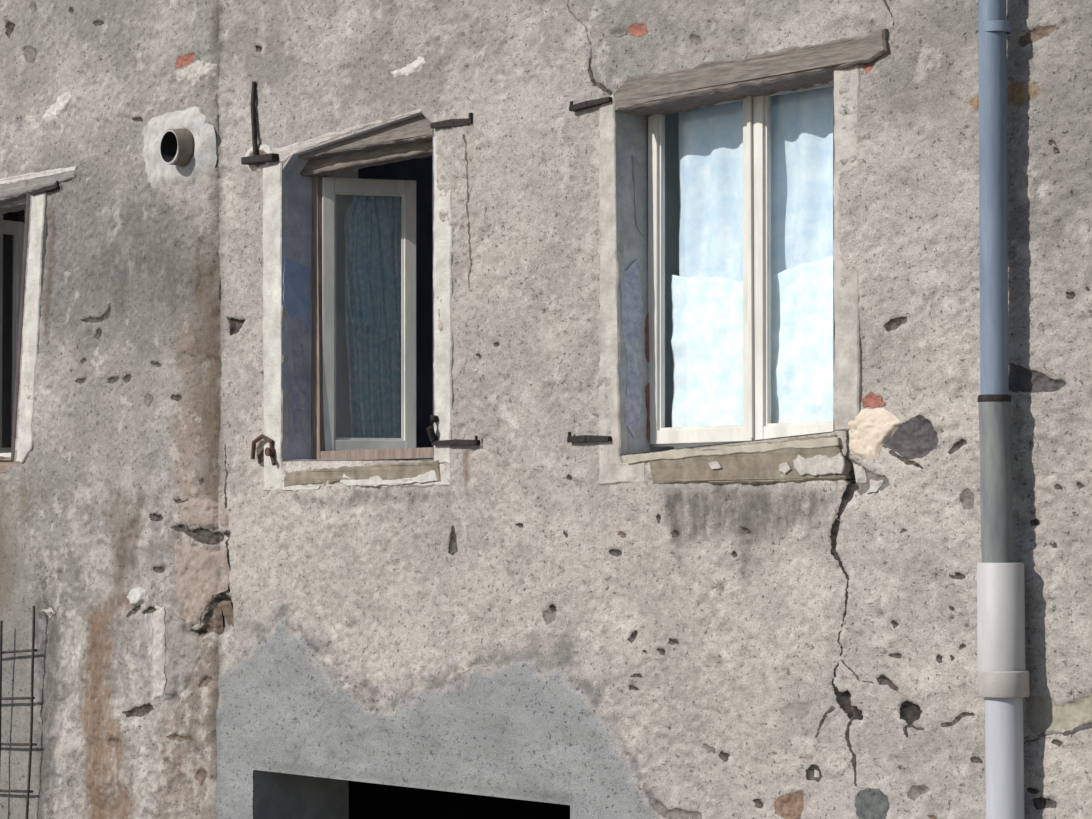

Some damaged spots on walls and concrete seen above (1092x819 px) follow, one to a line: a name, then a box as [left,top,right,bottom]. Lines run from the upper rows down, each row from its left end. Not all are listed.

crack [567,0,612,95]
flaking render [882,414,967,469]
spalling [149,478,234,637]
crack [815,477,873,786]
flaking render [122,605,168,717]
corrosion [83,600,132,819]
flaking render [1025,694,1092,746]
spalling [703,743,730,762]
spalling [649,798,702,819]
flaking render [752,764,822,819]
flaking render [854,788,889,819]
spalling [1027,788,1056,810]